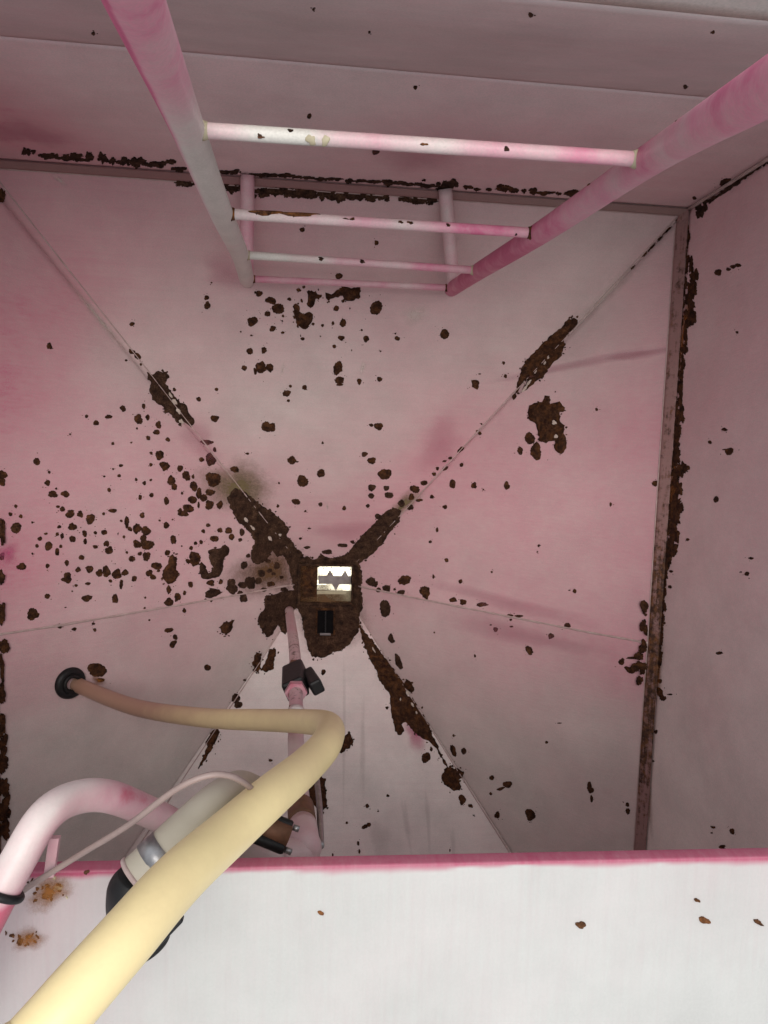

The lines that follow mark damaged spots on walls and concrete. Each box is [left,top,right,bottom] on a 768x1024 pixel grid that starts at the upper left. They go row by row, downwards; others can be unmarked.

corrosion [21,147,195,187]
corrosion [219,169,590,232]
corrosion [240,273,386,386]
corrosion [501,315,578,400]
corrosion [517,391,568,460]
corrosion [615,162,768,701]
corrosion [0,504,35,585]
corrosion [16,349,475,817]
corrosion [0,639,11,841]
corrosion [27,876,68,904]
corrosion [5,931,40,947]